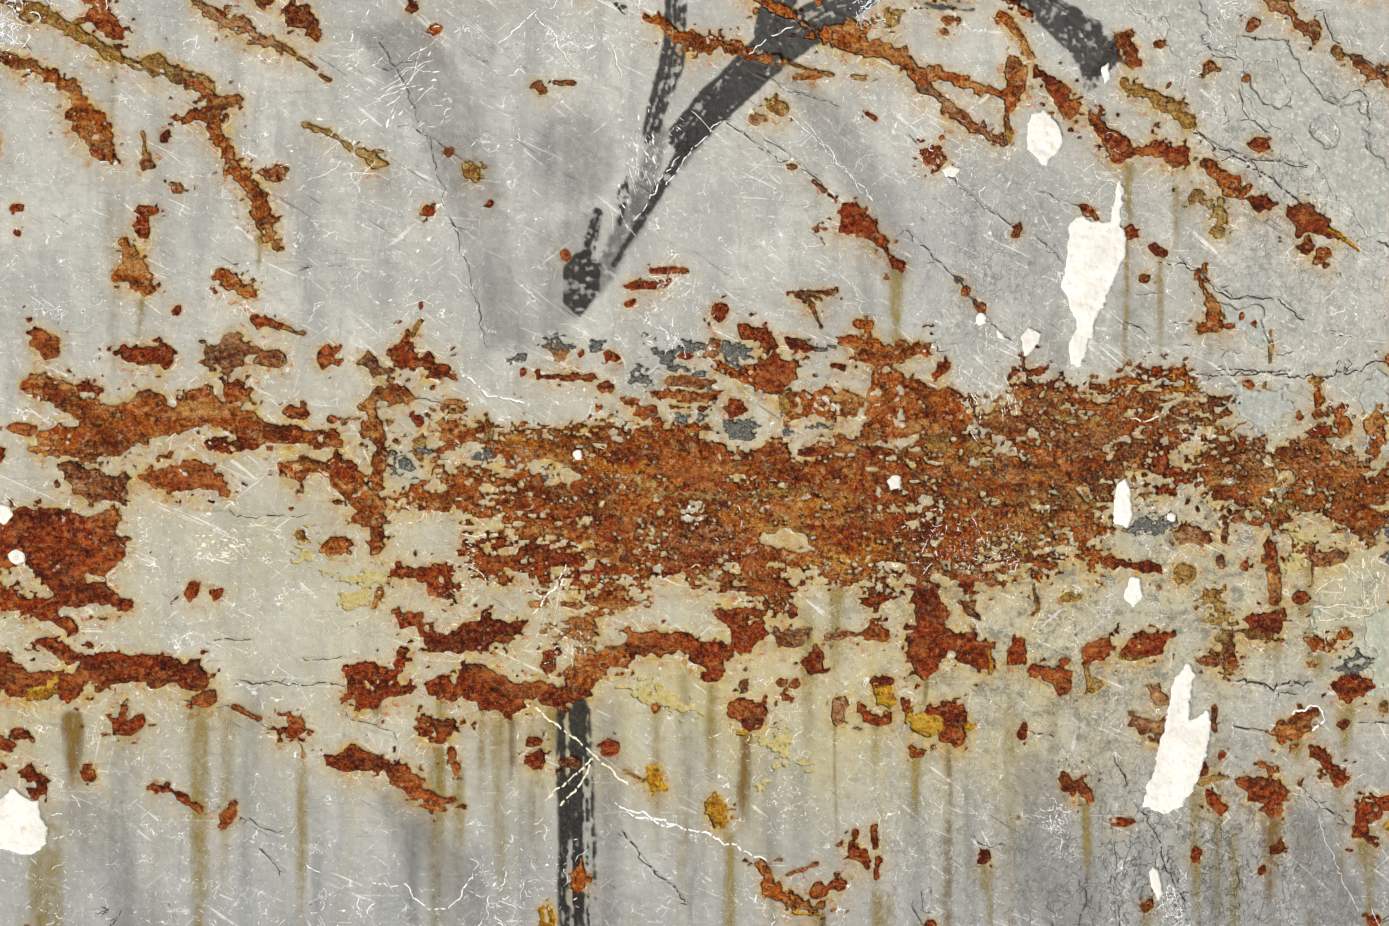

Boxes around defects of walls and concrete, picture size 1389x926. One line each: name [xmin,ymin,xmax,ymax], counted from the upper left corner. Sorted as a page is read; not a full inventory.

corrosion [405,0,419,13]
corrosion [1240,0,1389,87]
corrosion [0,0,289,252]
corrosion [443,147,487,182]
corrosion [642,0,1361,328]
peeling [1027,110,1063,166]
peeling [1061,179,1127,367]
corrosion [0,179,1389,886]
peeling [1143,663,1211,814]
peeling [0,788,48,855]
corrosion [566,858,593,893]
corrosion [726,837,853,926]